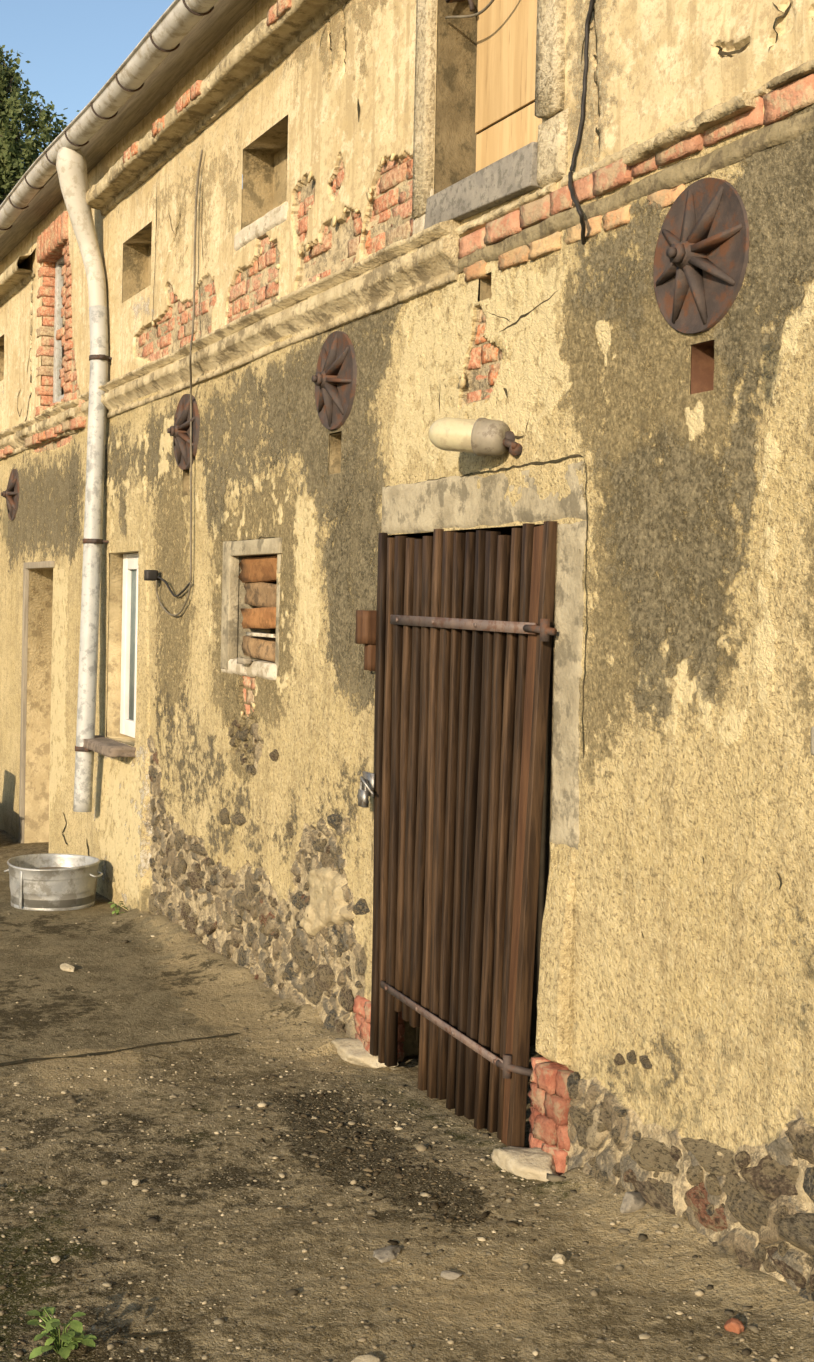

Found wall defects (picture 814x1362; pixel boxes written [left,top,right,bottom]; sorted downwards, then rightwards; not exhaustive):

flaking render [297,153,413,282]
flaking render [50,244,79,407]
flaking render [138,237,280,361]
flaking render [457,310,502,404]
flaking render [30,436,72,452]